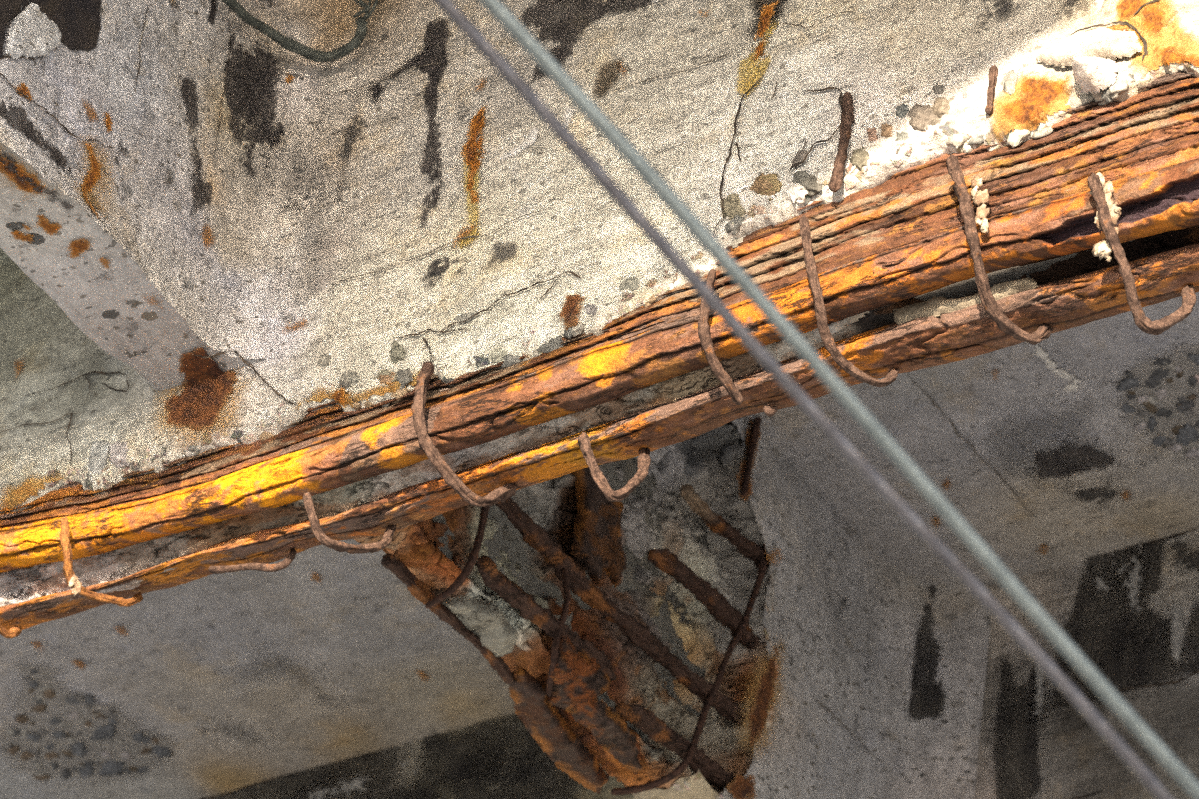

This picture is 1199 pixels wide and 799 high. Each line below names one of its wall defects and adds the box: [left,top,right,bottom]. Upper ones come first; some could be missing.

peeling [0,0,102,60]
water stain [521,0,659,66]
corrosion [1107,0,1199,72]
water stain [369,19,452,229]
corrosion [992,76,1071,139]
spalling [1020,225,1199,285]
crack [395,271,581,362]
corrosion [165,347,237,431]
crack [186,346,297,405]
spalling [0,339,799,606]
spalling [354,425,778,790]
water stain [1062,538,1199,693]